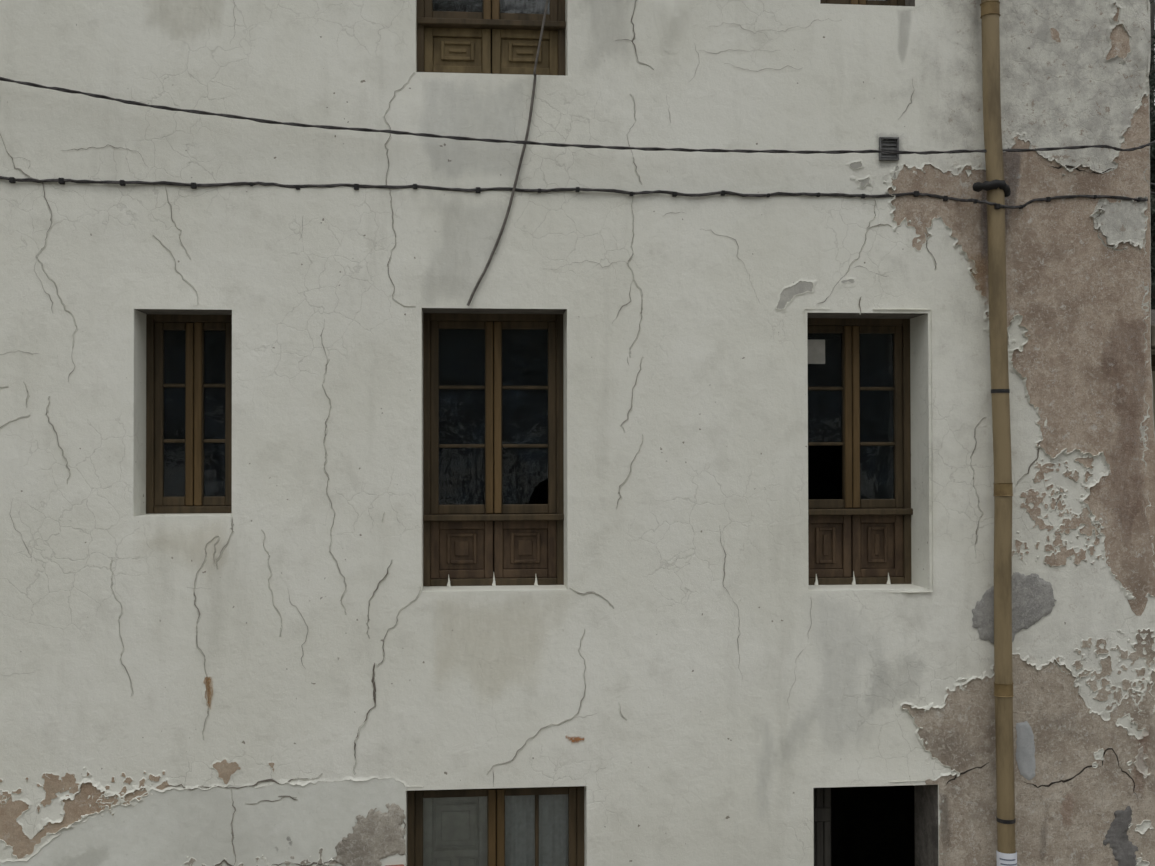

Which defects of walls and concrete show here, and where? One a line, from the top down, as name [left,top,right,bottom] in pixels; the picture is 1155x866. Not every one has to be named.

flaking render [1103,0,1132,65]
crack [0,135,78,484]
crack [383,73,416,308]
crack [552,94,644,509]
flaking render [844,158,990,347]
flaking render [1003,56,1155,601]
crack [321,319,422,775]
flaking render [0,763,178,860]
crack [165,774,323,866]
flaking render [899,654,998,866]
crack [1025,748,1138,799]
flaking render [1012,628,1155,866]